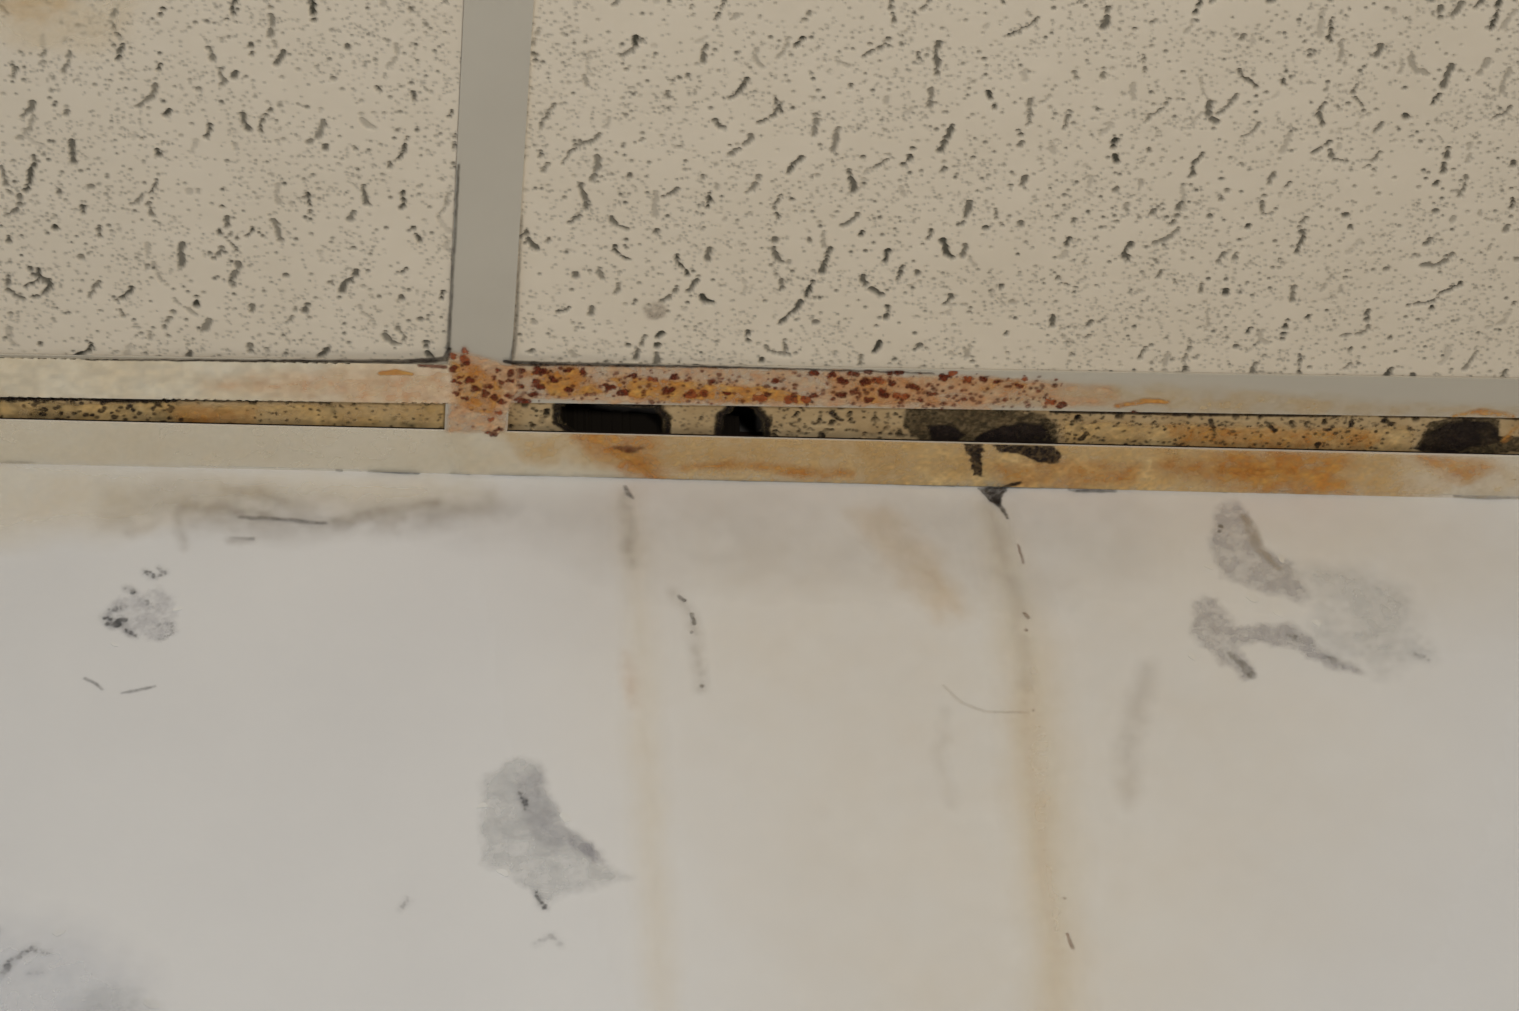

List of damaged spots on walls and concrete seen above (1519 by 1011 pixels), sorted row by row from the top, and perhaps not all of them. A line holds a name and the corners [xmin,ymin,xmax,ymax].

rust [449,348,1168,437]
rust [580,434,665,479]
rust [874,442,1403,496]